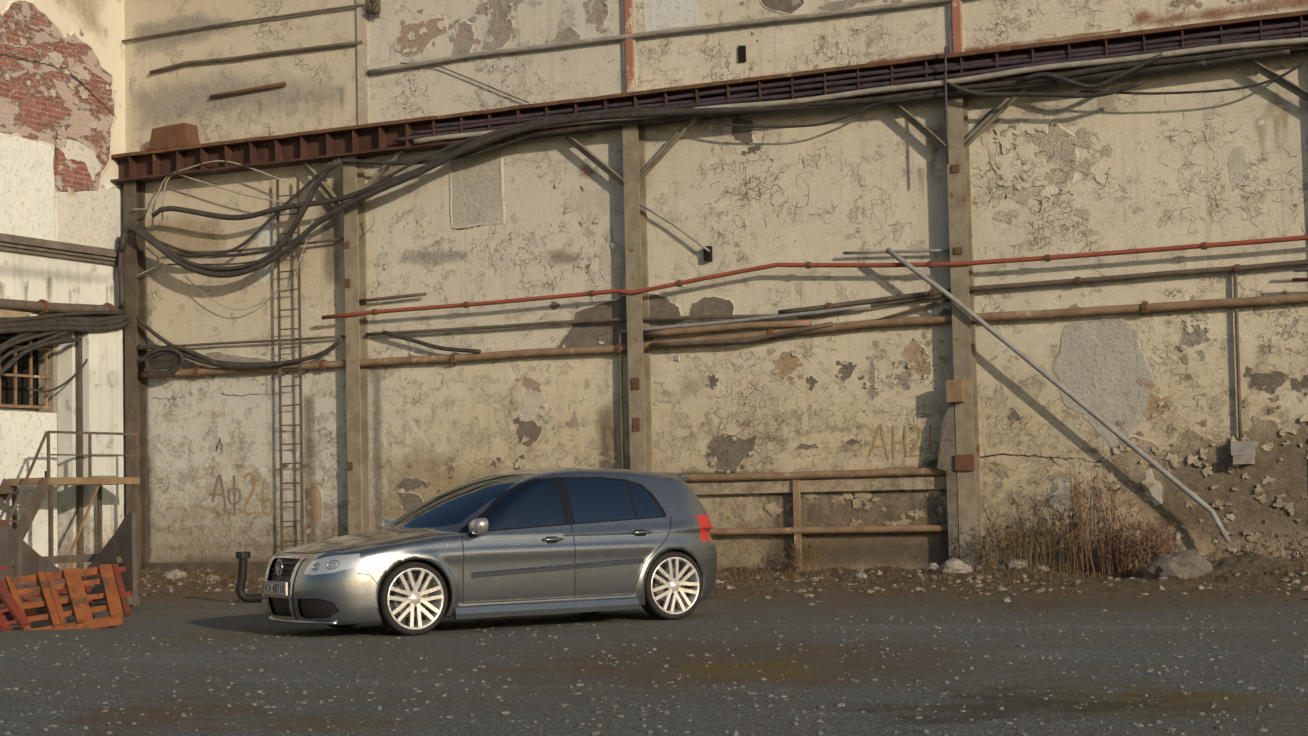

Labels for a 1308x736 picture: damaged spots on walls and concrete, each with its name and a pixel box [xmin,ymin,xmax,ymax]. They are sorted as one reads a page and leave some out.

spalling [393,0,523,63]
spalling [740,0,903,16]
flaking render [0,0,118,241]
spalling [649,292,735,341]
peeling [489,376,579,470]
spalling [705,432,759,474]
spalling [767,348,818,391]
spalling [836,330,885,413]
spalling [892,331,950,390]
crack [876,339,1108,466]
spalling [983,303,1308,570]